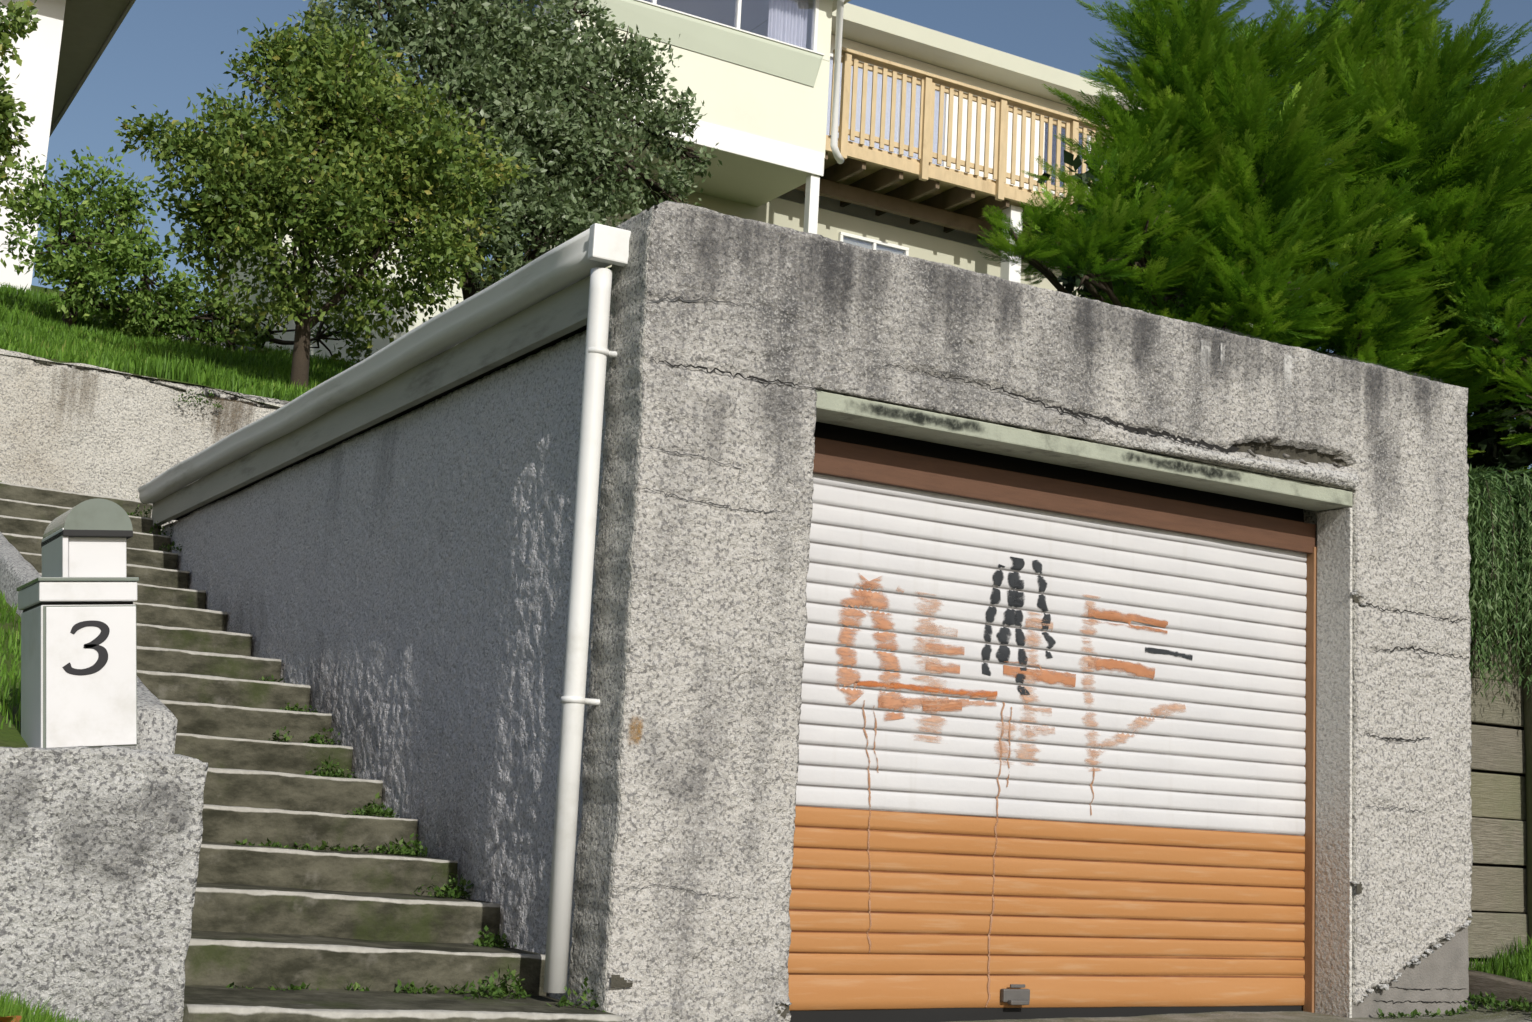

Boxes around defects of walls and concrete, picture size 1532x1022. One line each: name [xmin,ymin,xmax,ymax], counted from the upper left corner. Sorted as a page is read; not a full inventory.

leakage [1201,340,1224,364]
crack [648,359,823,389]
crack [874,364,1240,452]
flaking render [1232,435,1347,468]
crack [1365,602,1469,659]
crack [1367,733,1430,743]